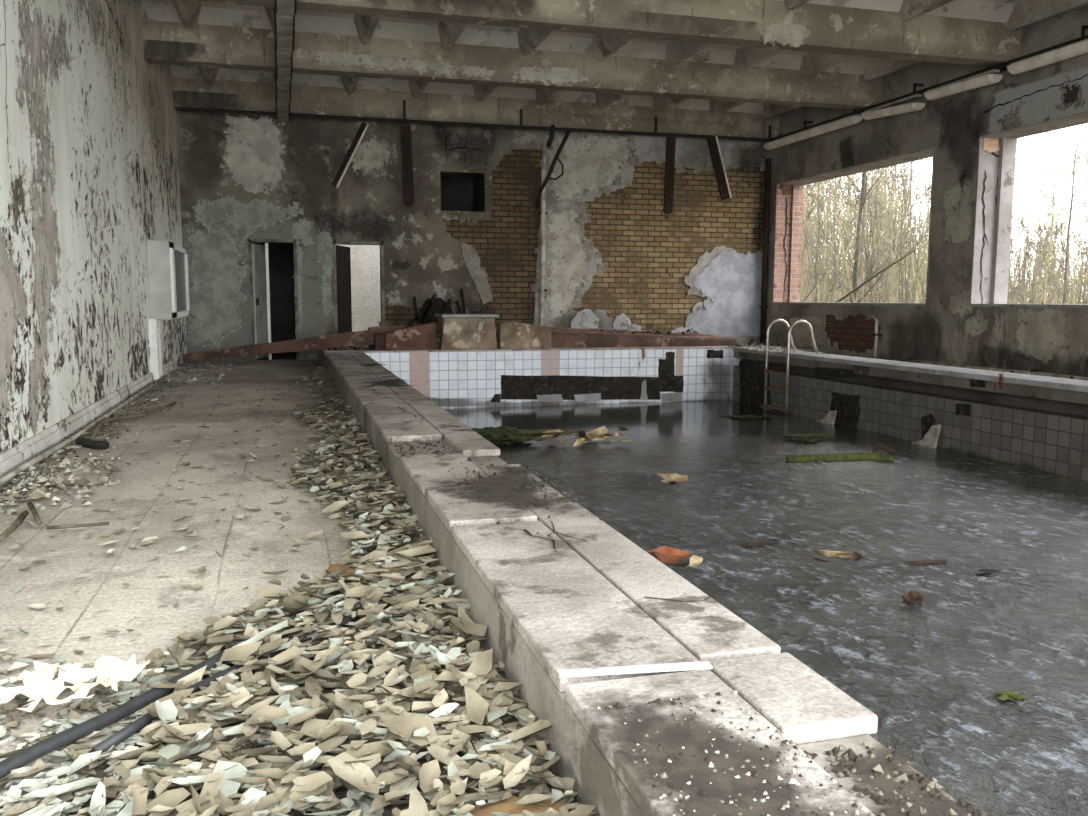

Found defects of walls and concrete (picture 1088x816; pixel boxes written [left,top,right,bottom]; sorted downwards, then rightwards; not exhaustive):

peeling [758,22,815,48]
peeling [308,50,496,80]
peeling [516,60,590,87]
water stain [289,132,388,238]
peeling [0,0,142,451]
peeling [126,113,334,349]
flaking render [432,132,765,338]
flaking render [379,305,421,326]
flaking render [785,312,883,354]
peeling [491,352,684,402]